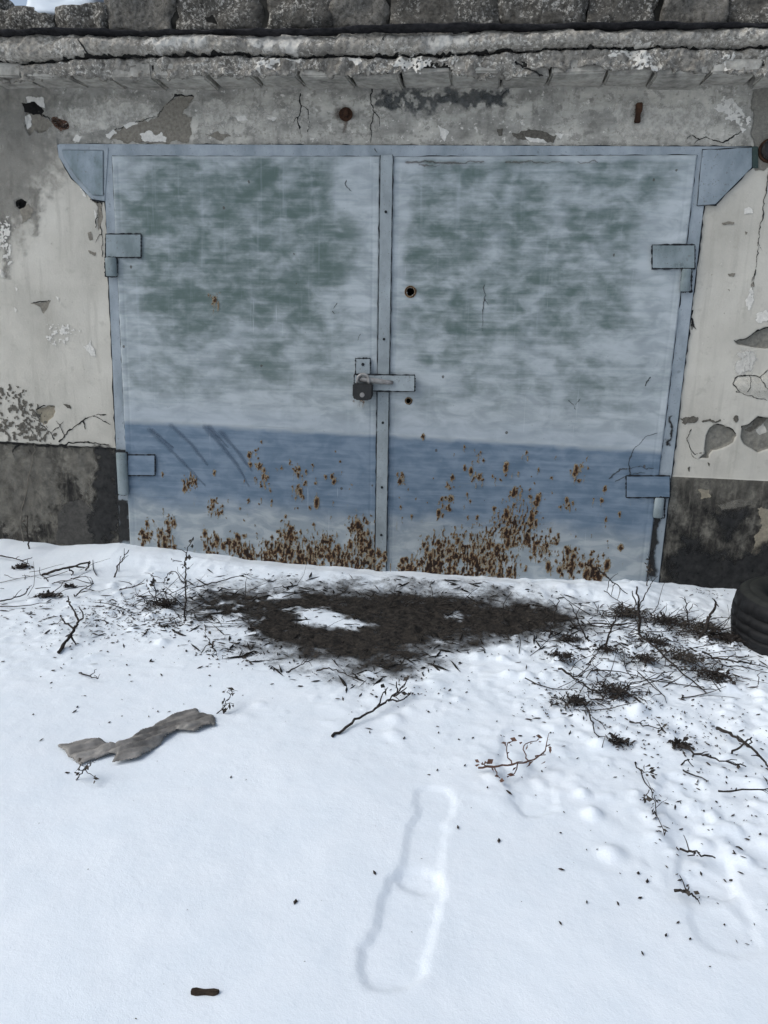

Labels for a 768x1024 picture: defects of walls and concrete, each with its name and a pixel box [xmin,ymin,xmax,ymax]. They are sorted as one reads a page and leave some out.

spalling [22,96,51,134]
peeling [69,94,296,144]
crack [294,93,310,141]
crack [370,89,380,137]
water stain [375,87,509,115]
crack [751,176,768,298]
spalling [0,384,71,444]
spalling [681,415,768,471]
water stain [0,446,98,537]
rust [138,508,177,550]
rust [181,472,197,494]
rust [200,440,624,582]